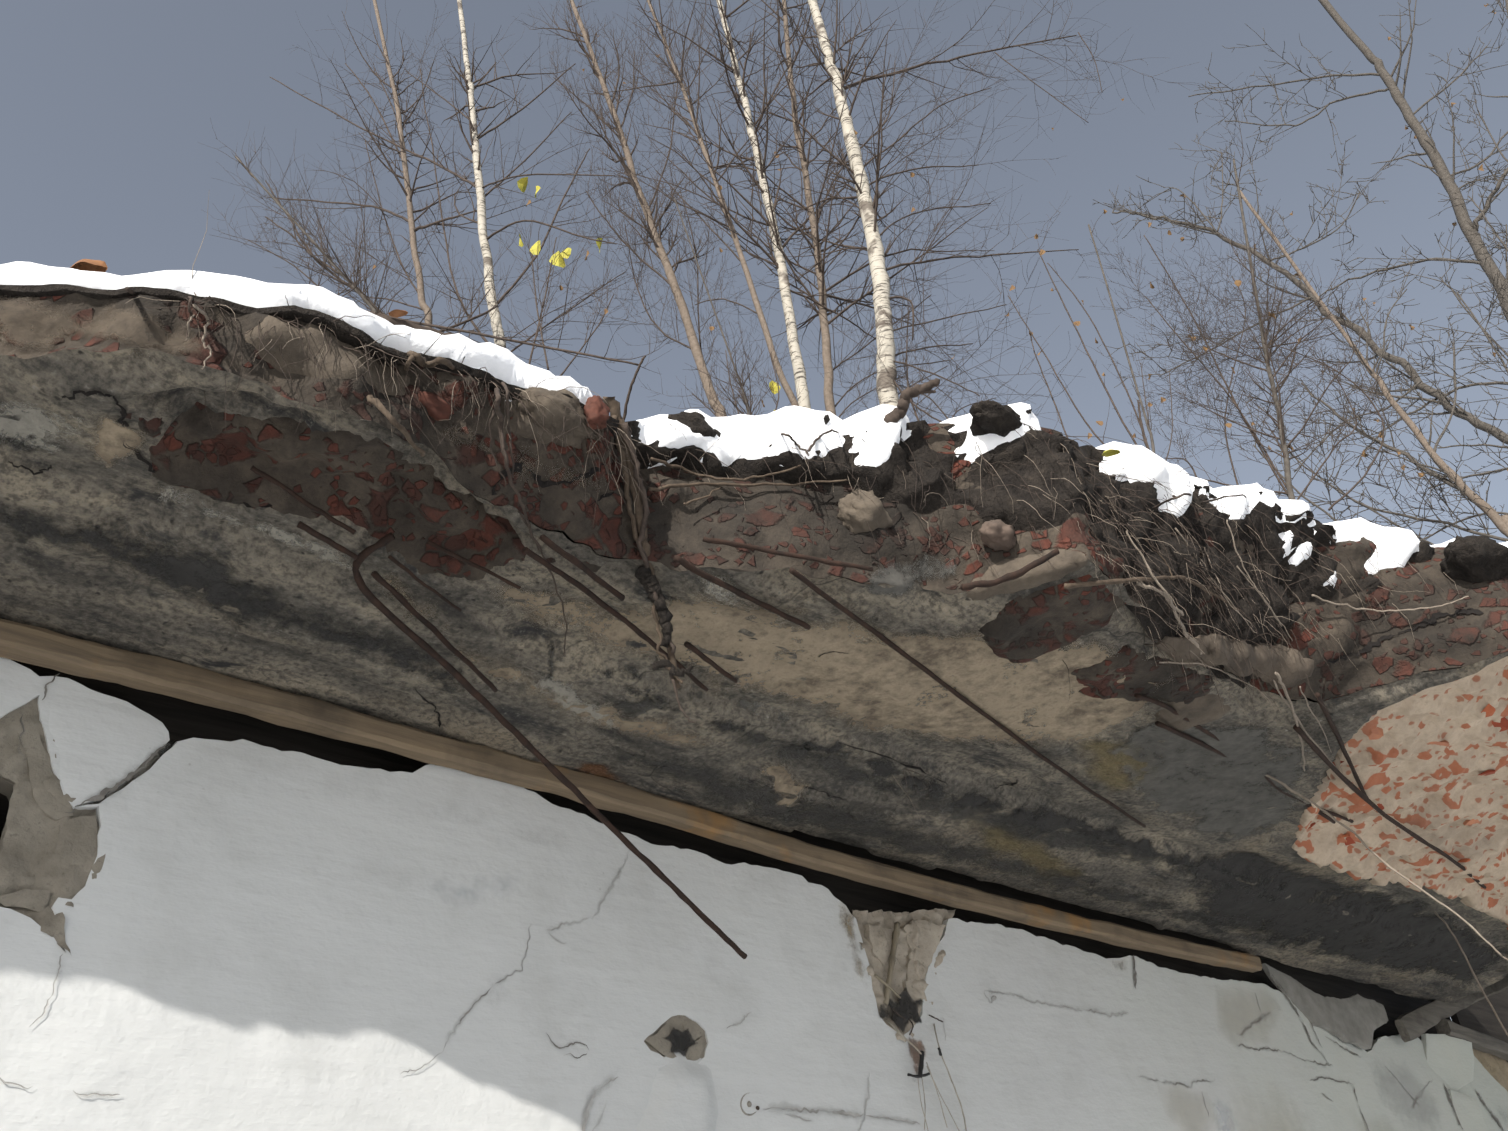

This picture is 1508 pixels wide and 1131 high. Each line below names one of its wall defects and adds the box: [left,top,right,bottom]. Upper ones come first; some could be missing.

leakage [205,509,350,567]
spalling [0,293,1144,663]
spalling [0,695,166,954]
leakage [455,575,1285,938]
spalling [1071,536,1508,930]
crack [403,853,628,1072]
crack [547,1034,618,1131]
spalling [644,1015,707,1061]
crack [763,1073,920,1129]
crack [984,955,1137,1017]
peeling [1262,963,1388,1050]
crack [1237,970,1503,1131]